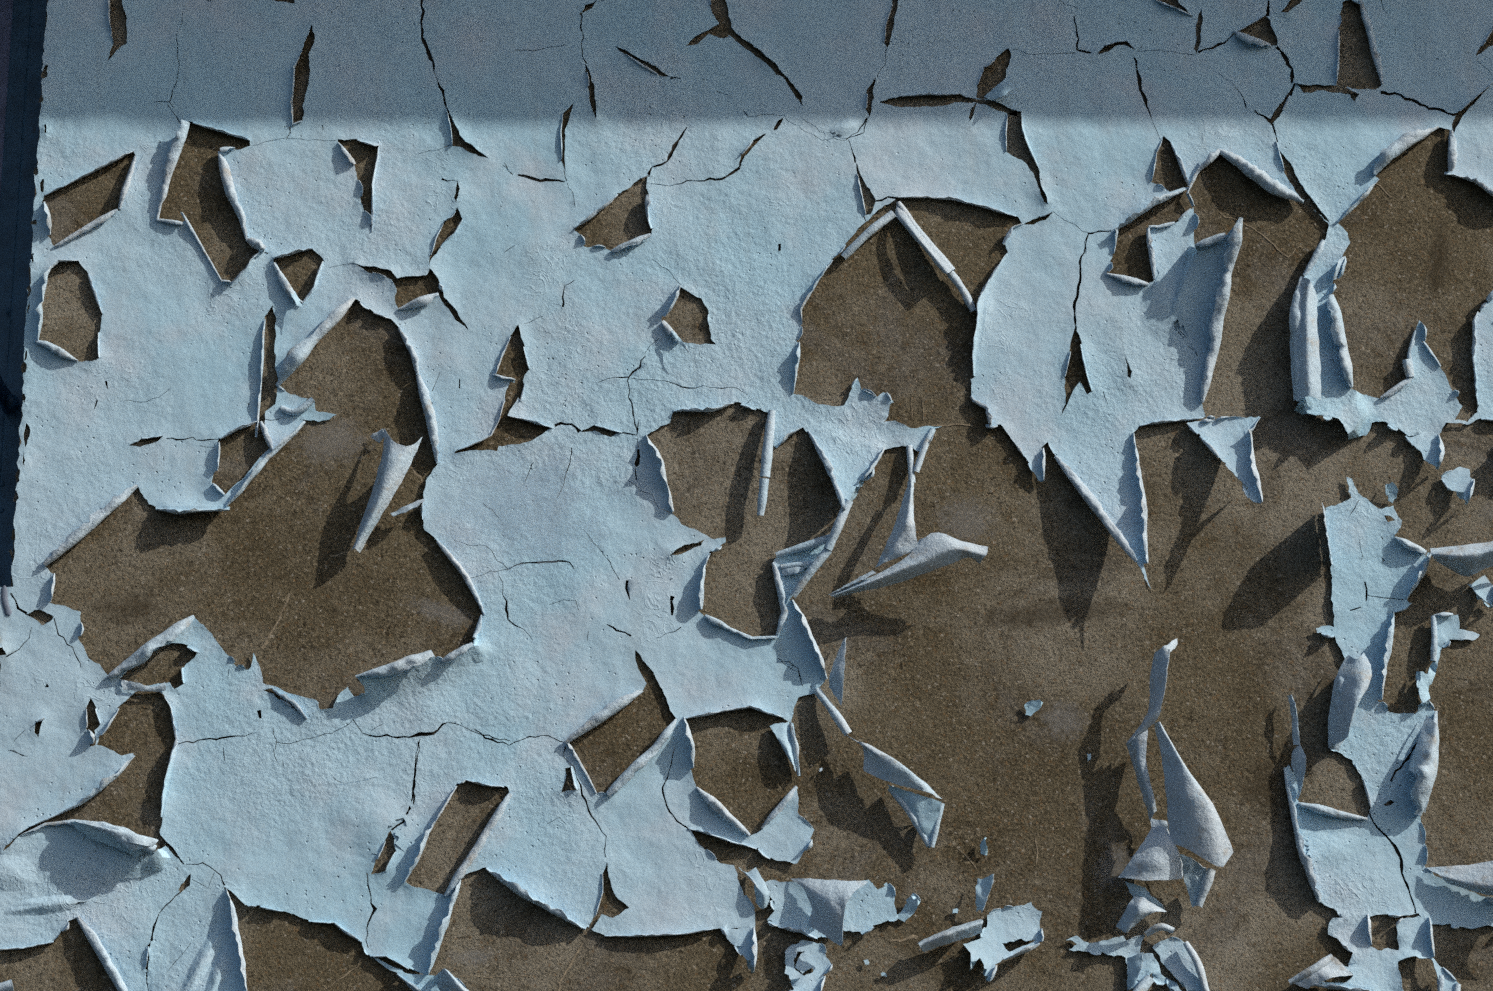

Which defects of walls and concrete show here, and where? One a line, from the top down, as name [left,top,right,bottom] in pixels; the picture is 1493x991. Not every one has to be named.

peeling [21,149,137,373]
crack [94,306,287,459]
peeling [156,119,326,310]
crack [273,0,323,141]
crack [420,0,1017,221]
peeling [976,49,1048,204]
crack [1025,210,1132,413]
crack [1013,0,1493,222]
crack [0,594,81,670]
peeling [3,208,486,861]
peeling [223,126,1493,991]
peeling [0,916,128,991]